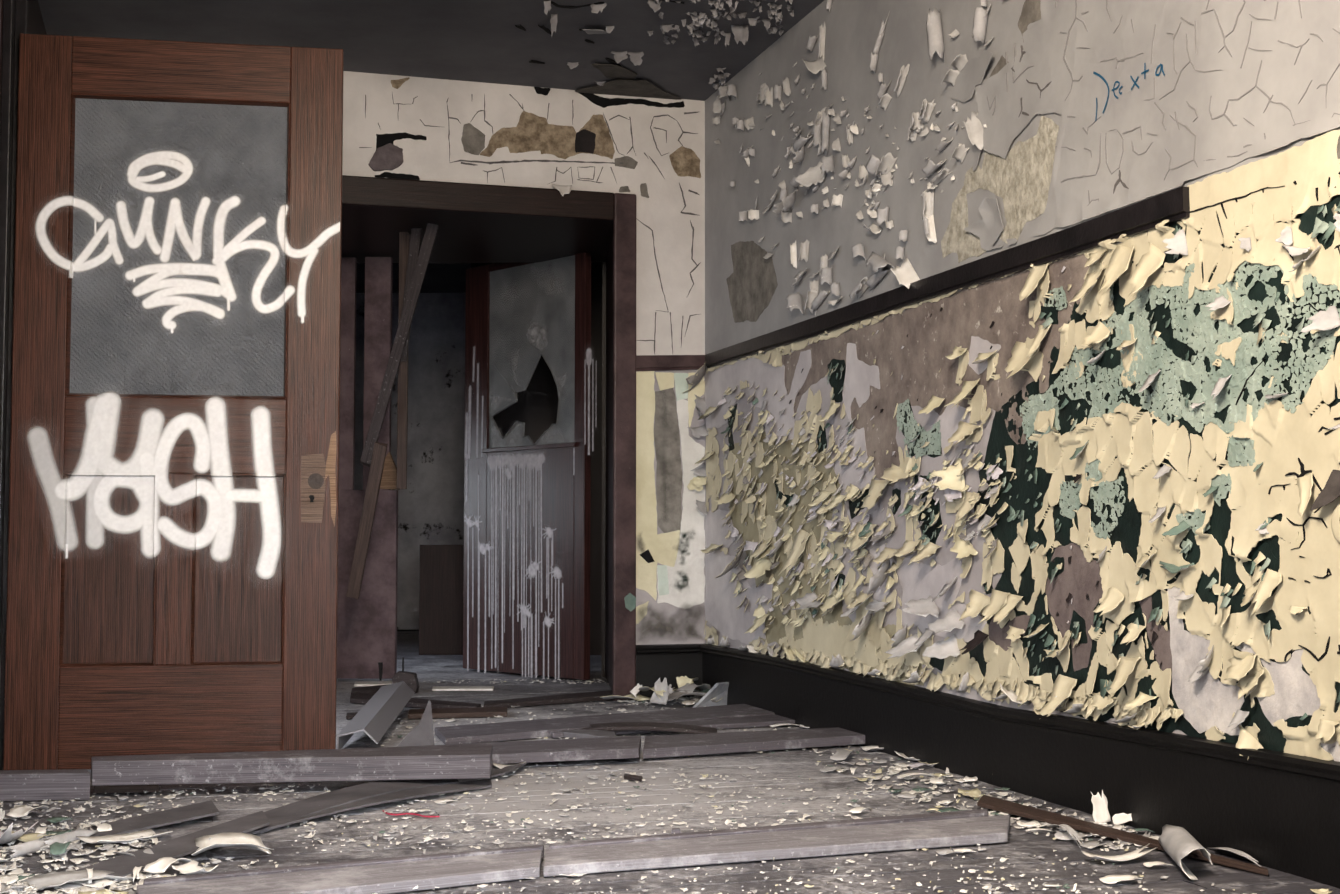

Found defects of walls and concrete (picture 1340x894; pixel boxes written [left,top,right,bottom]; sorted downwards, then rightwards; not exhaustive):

peeling [544,0,558,36]
peeling [582,3,615,34]
crack [987,0,1340,206]
spalling [368,132,427,180]
flaking render [461,111,638,169]
flaking render [619,183,649,198]
crack [1189,172,1340,219]
crack [359,94,701,354]
peeling [624,0,1340,761]
crack [1318,417,1340,435]
crack [1268,458,1332,583]
crack [1284,636,1340,662]